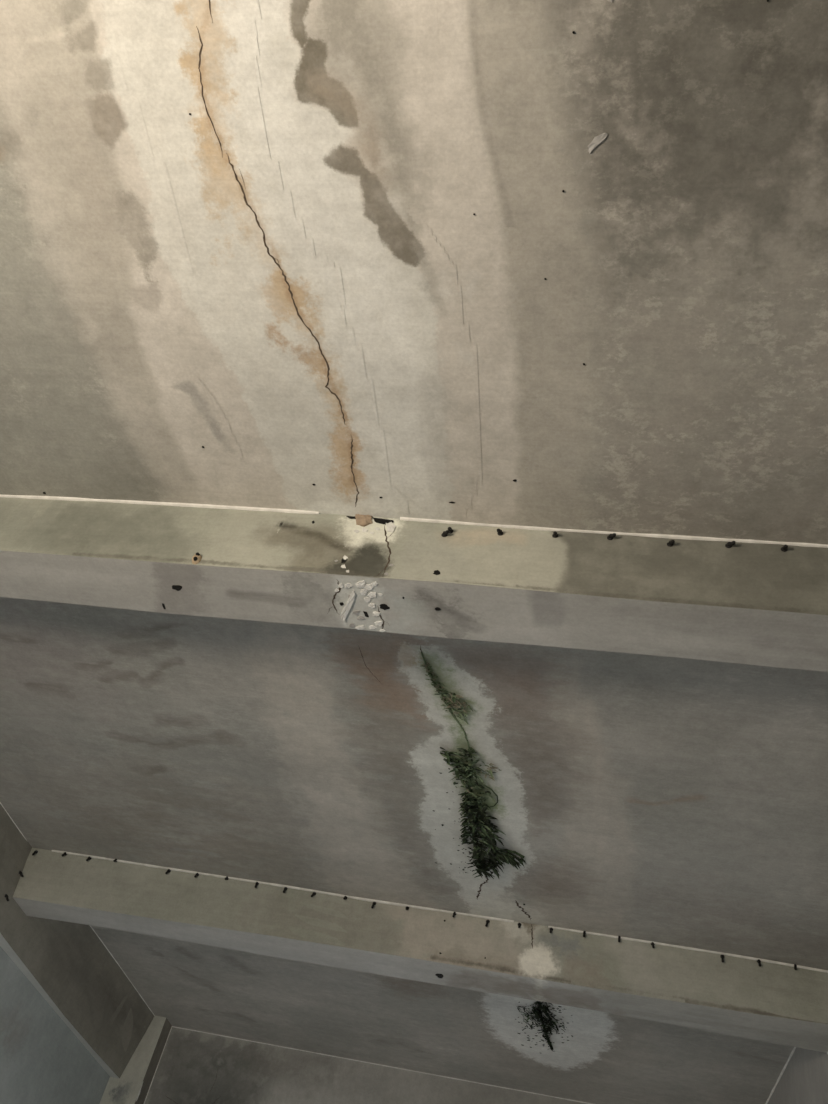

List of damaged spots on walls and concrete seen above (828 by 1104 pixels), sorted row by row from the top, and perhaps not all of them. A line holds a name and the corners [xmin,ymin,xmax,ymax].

rust [148,0,391,493]
crack [196,0,359,507]
leakage [0,0,828,560]
leakage [0,497,828,970]
leakage [135,878,828,1104]